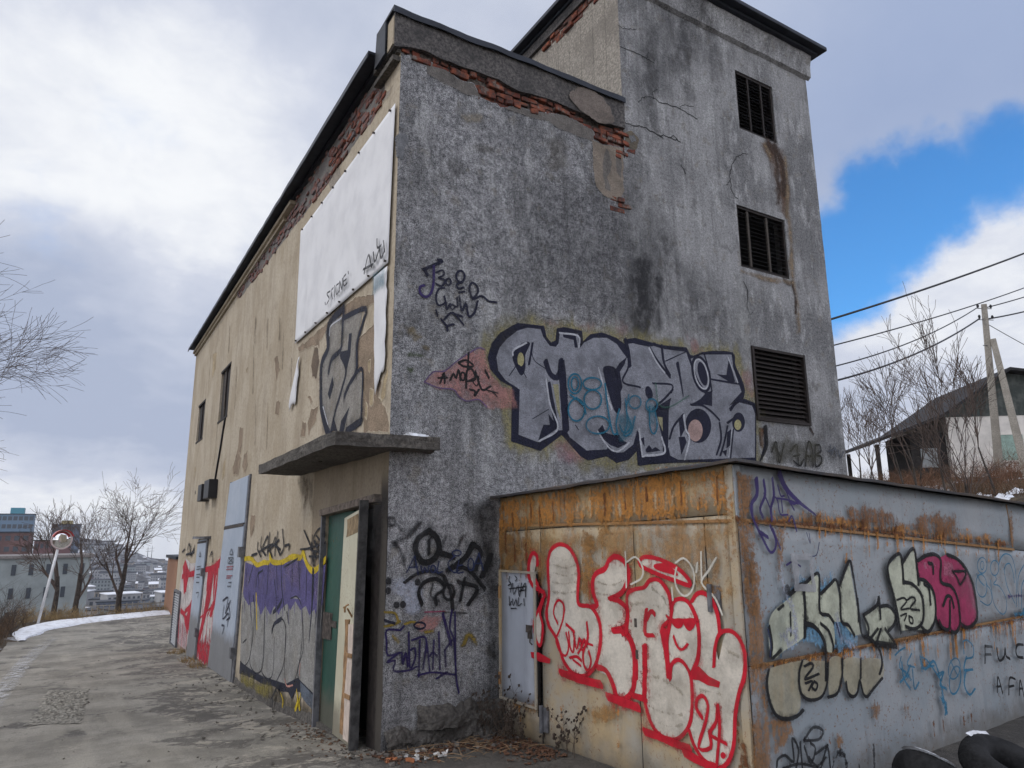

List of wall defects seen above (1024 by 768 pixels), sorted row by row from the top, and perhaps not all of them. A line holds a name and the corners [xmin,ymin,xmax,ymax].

flaking render [237,80,393,298]
flaking render [395,120,415,161]
flaking render [401,48,639,214]
crack [625,90,697,174]
rust [741,139,800,330]
rust [499,466,1024,768]